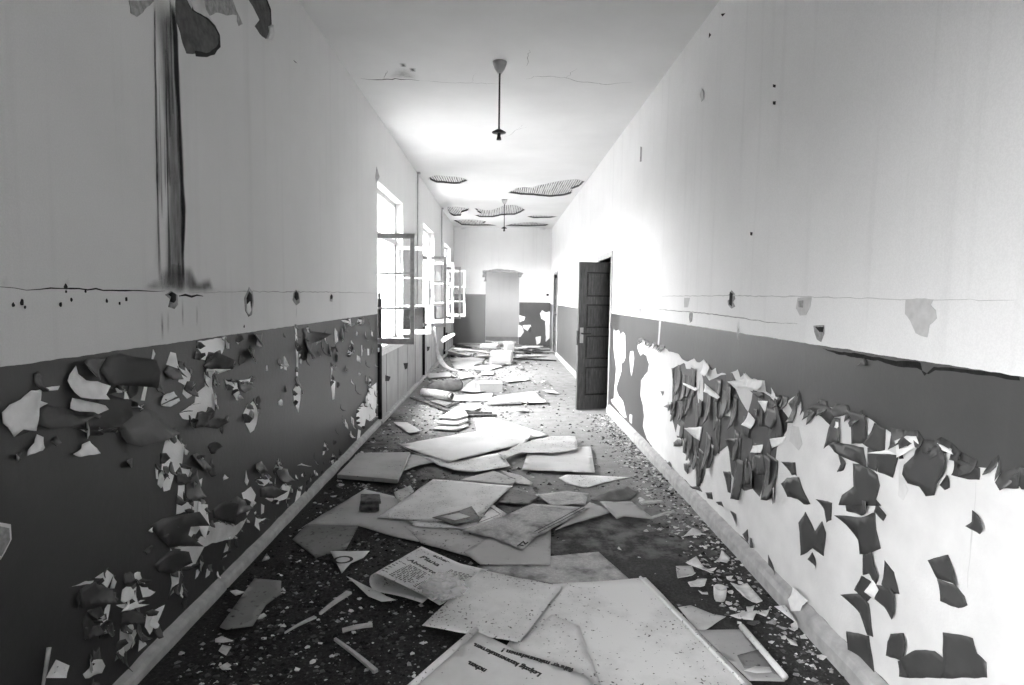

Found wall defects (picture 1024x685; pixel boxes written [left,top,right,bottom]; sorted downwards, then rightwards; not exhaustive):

peeling [129,0,155,17]
peeling [175,0,242,57]
peeling [249,0,274,41]
damp [154,9,209,289]
flaking render [447,179,585,227]
spalling [244,287,254,317]
spalling [796,297,812,315]
spalling [905,298,937,337]
peeling [427,310,559,380]
peeling [2,317,415,685]
peeling [593,321,1024,685]
spalling [0,523,12,560]